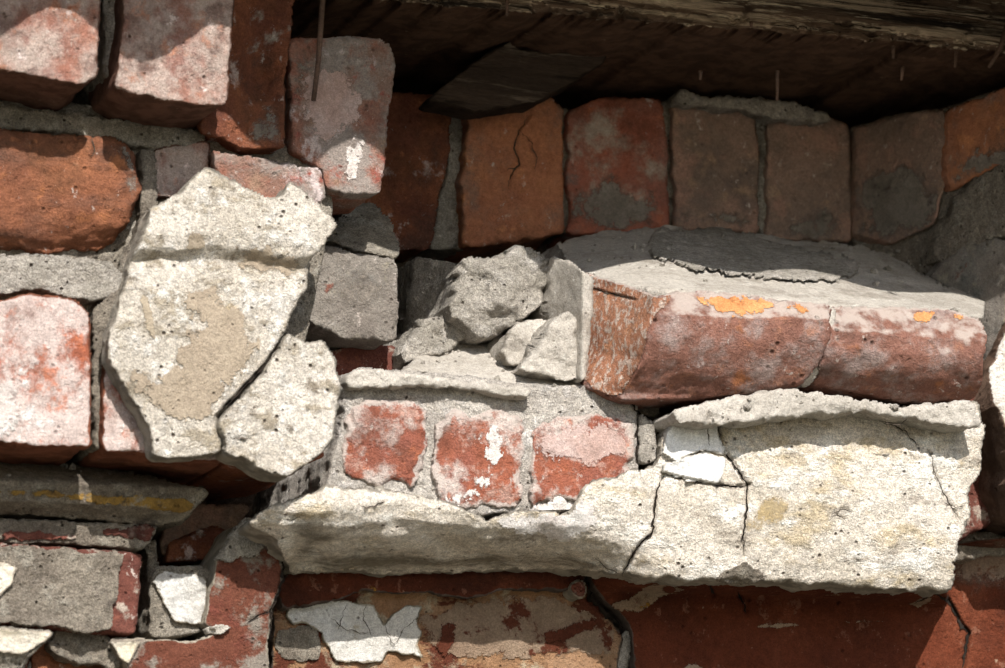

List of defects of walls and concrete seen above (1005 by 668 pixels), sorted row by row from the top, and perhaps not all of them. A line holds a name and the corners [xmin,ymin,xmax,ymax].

crack [508,120,538,190]
crack [216,330,288,417]
crack [632,404,659,462]
crack [584,427,751,628]
peeling [275,579,615,664]
peeling [612,584,684,613]